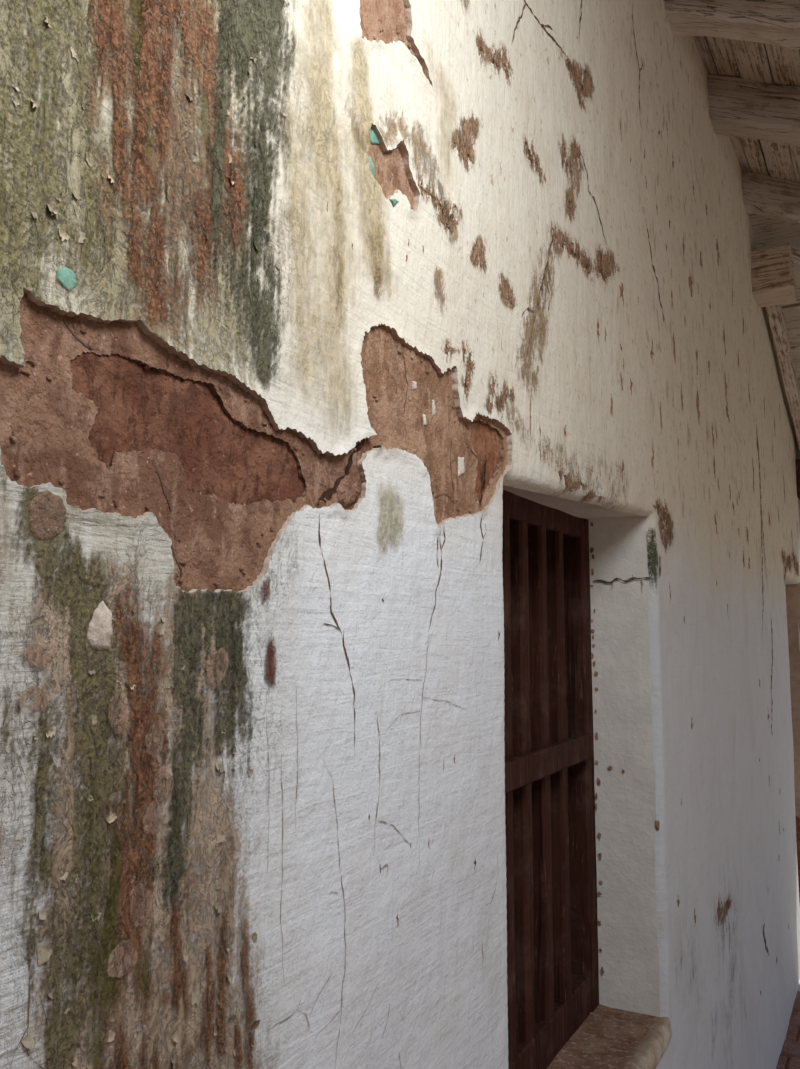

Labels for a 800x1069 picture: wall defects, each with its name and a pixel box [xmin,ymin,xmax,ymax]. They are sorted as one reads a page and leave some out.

leakage [57,46,86,232]
leakage [201,0,307,389]
peeling [359,0,433,87]
leakage [346,45,458,298]
peeling [368,123,463,234]
spalling [450,116,479,171]
crack [511,0,582,54]
peeling [0,287,515,593]
leakage [153,589,254,911]
crack [319,516,462,873]
crack [593,575,650,587]
crack [266,687,401,1067]